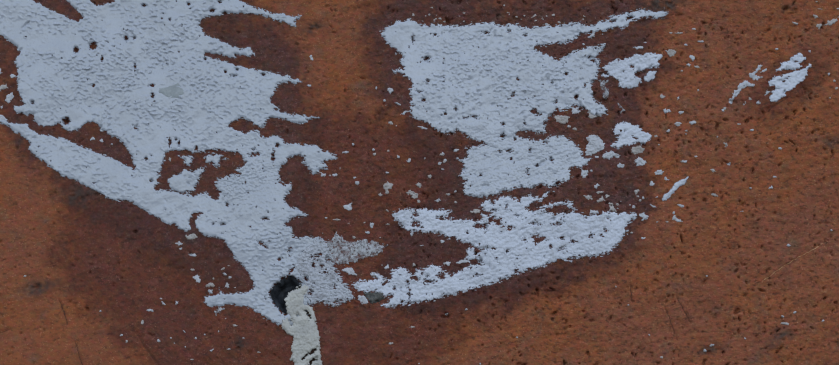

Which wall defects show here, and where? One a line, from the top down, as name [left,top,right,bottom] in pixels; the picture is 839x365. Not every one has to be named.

water stain [33,0,83,22]
water stain [0,35,152,176]
peeling [0,0,688,326]
water stain [52,0,674,365]
peeling [723,50,811,110]
water stain [782,62,817,98]